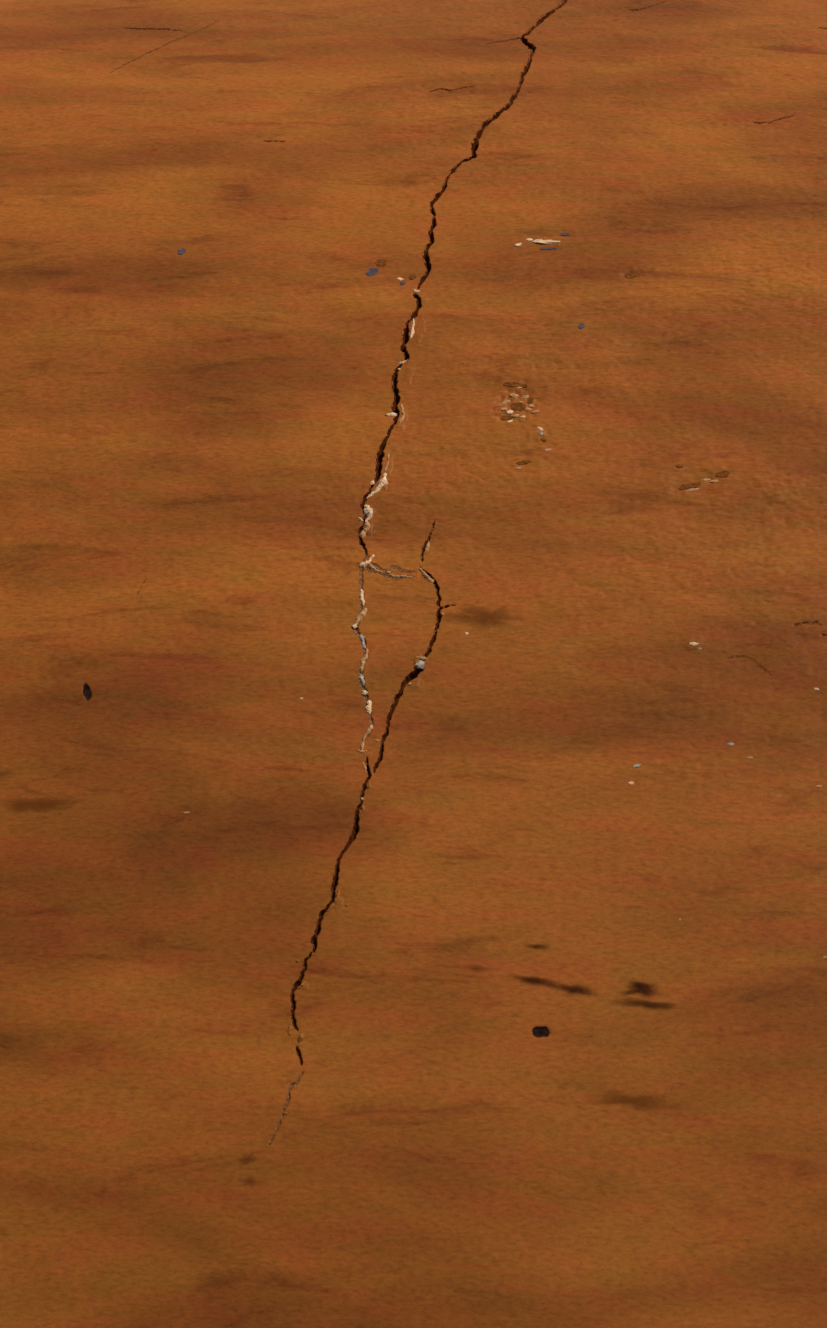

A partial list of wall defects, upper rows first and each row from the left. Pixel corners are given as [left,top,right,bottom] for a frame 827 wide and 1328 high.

crack [269,0,567,1144]